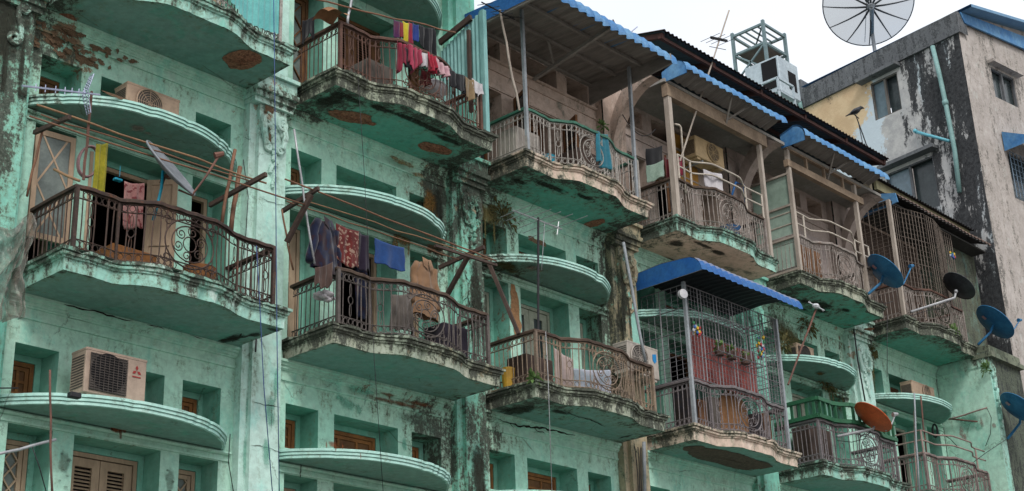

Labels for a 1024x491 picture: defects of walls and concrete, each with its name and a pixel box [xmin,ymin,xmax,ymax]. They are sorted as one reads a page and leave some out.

water stain [0,0,30,96]
peeling [34,13,139,69]
spalling [222,50,262,70]
spalling [328,110,377,126]
spalling [418,142,452,155]
water stain [433,185,444,222]
crack [64,304,162,328]
water stain [468,261,487,357]
crack [499,411,631,439]
water stain [468,445,486,491]
peeling [683,446,773,471]